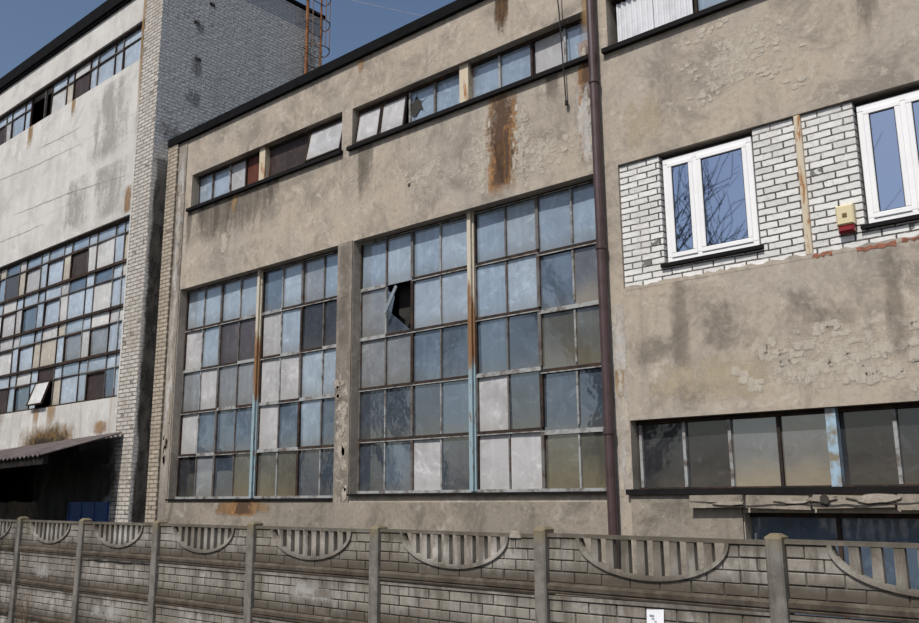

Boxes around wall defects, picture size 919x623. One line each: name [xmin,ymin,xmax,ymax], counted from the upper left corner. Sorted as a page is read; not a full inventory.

rust [495,0,508,29]
rust [486,94,517,191]
rust [576,41,593,173]
peeling [680,15,806,112]
water stain [132,228,163,520]
peeling [729,316,919,393]
spalling [334,371,348,502]
spalling [773,493,902,504]